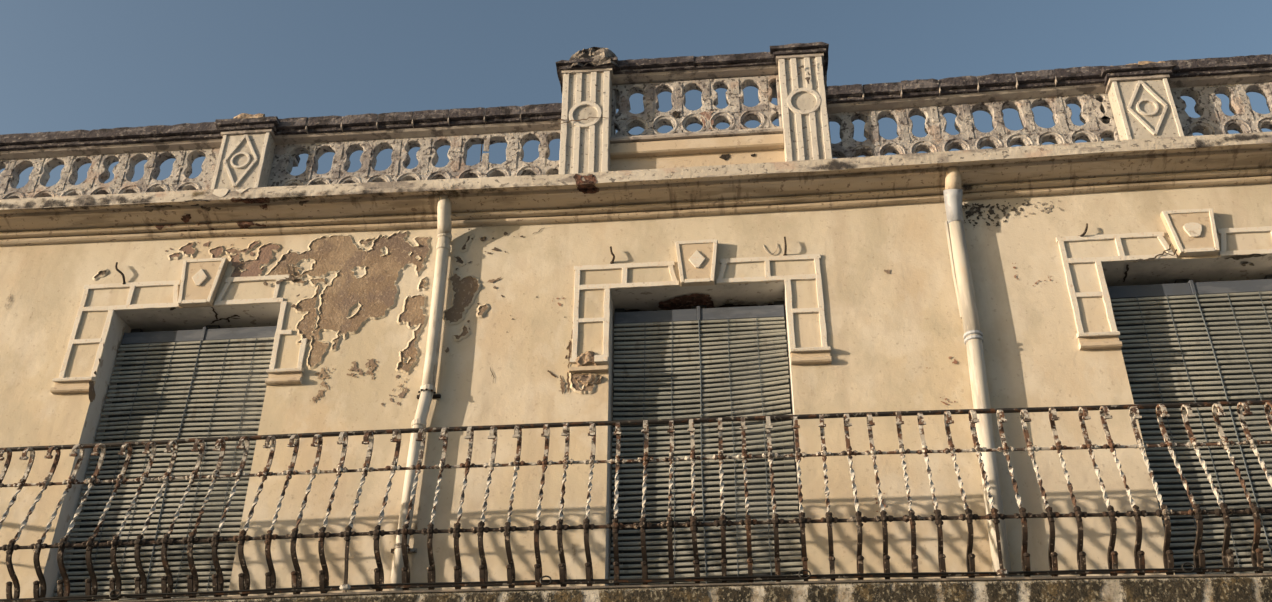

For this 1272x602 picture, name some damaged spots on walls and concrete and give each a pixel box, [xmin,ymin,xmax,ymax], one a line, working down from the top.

water stain [962,185,1072,227]
peeling [155,187,432,406]
peeling [443,229,523,353]
flaking render [560,372,598,394]
water stain [203,589,583,602]
water stain [599,576,1272,602]